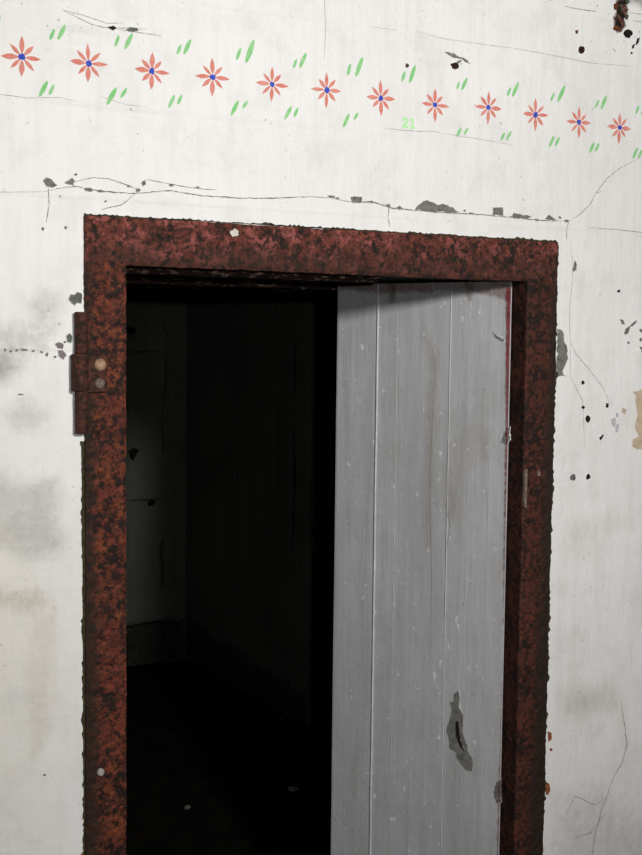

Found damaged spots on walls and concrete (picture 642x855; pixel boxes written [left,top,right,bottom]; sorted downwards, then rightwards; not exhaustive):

rust [613,0,633,38]
crack [45,160,642,315]
rust [340,281,511,580]
peeling [553,324,568,458]
peeling [605,389,642,449]
peeling [446,689,473,771]
crack [566,705,628,854]